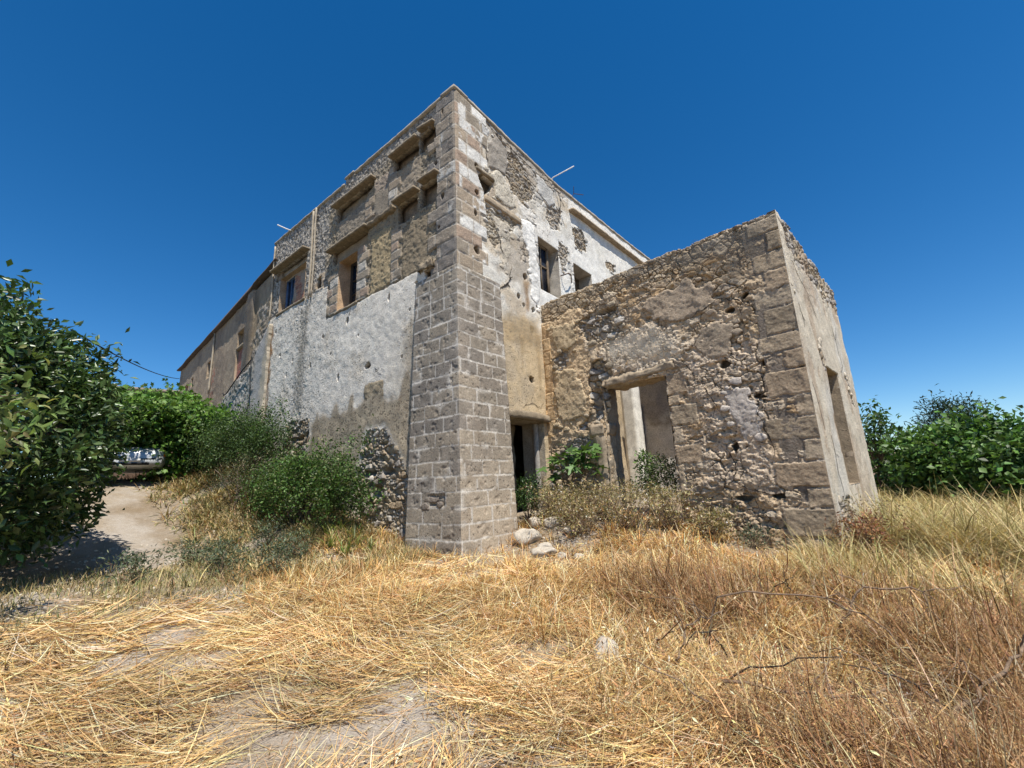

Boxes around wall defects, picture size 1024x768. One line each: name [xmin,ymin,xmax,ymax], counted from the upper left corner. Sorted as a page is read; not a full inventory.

spalling [470,111,588,313]
water stain [309,372,412,483]
spalling [352,427,408,538]
flaking render [642,277,768,452]